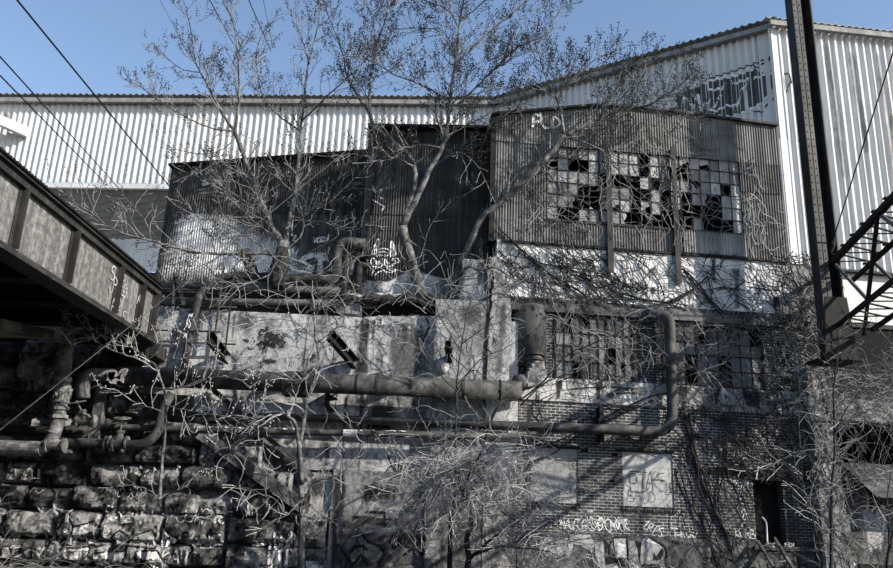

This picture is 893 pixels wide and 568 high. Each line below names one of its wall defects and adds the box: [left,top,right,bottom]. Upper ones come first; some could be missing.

leakage [197,309,343,367]